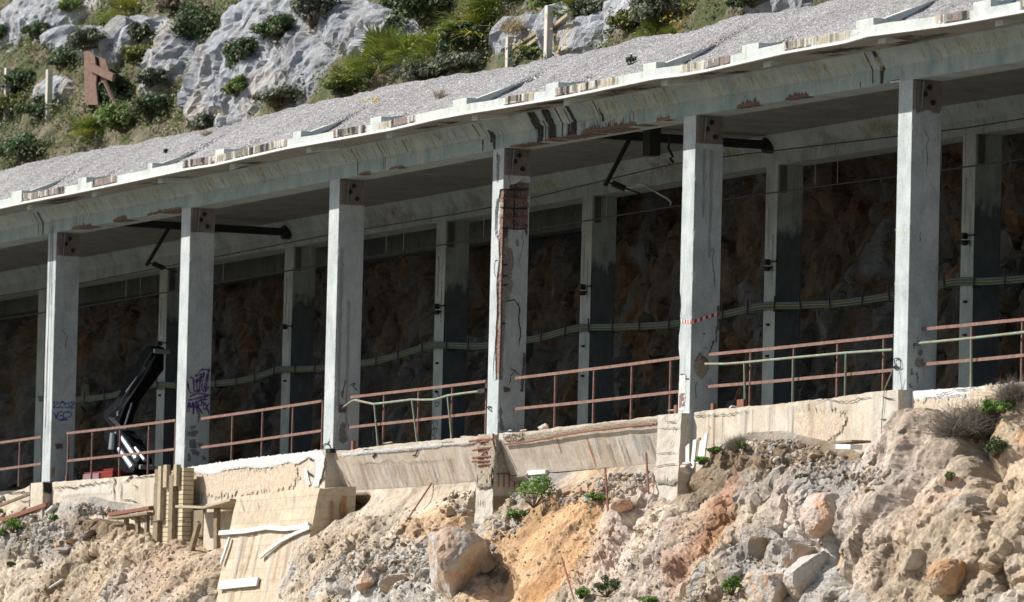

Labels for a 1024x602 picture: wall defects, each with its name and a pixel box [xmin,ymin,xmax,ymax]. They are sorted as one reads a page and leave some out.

leakage [437,256,468,440]
crack [493,231,524,386]
spalling [495,182,530,392]
spalling [678,353,710,411]
leakage [768,214,802,405]
leakage [965,178,1001,387]